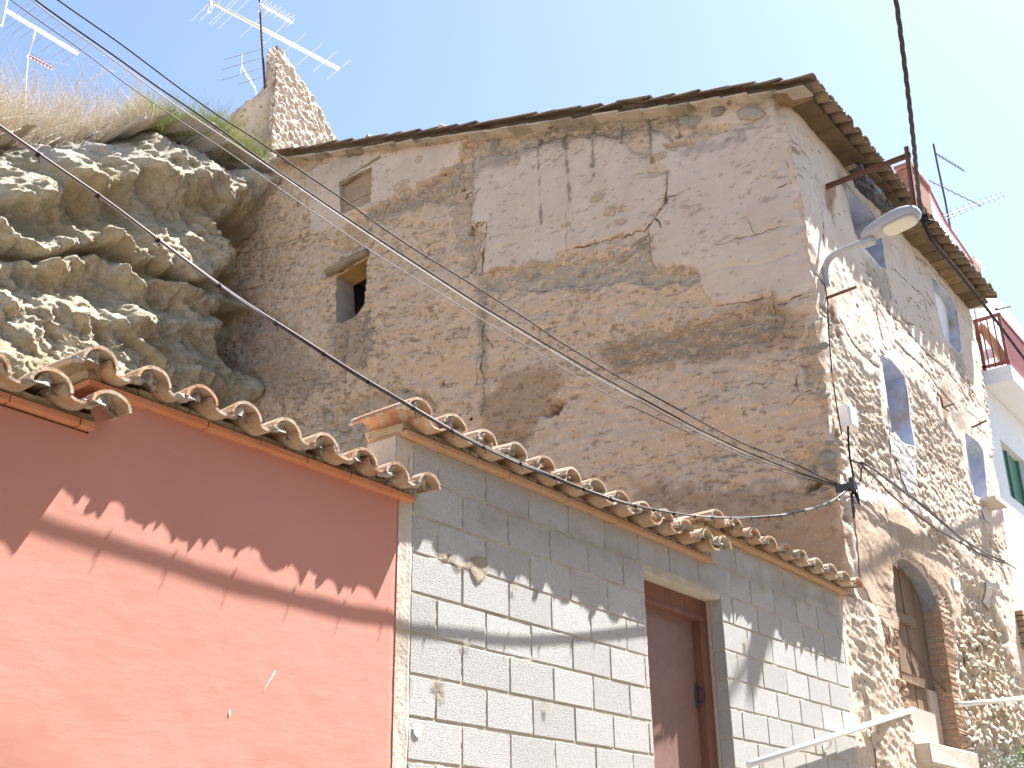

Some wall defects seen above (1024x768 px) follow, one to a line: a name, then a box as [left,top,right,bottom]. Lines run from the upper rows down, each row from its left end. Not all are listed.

crack [564,171,677,259]
crack [716,221,791,245]
crack [476,312,493,410]
spalling [436,553,488,583]